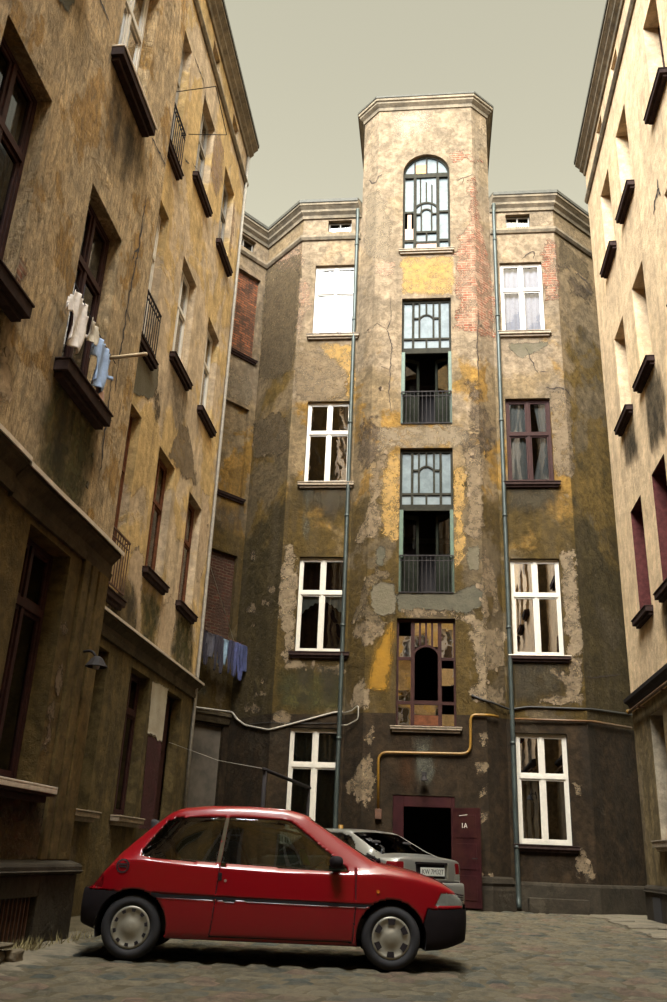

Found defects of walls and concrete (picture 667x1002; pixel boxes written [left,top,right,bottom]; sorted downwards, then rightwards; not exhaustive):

flaking render [452,176,496,338]
flaking render [539,239,593,301]
crack [98,196,147,480]
flaking render [462,446,485,539]
flaking render [246,544,346,676]
flaking render [351,566,393,647]
flaking render [401,549,507,704]
flaking render [539,549,585,706]
flaking render [350,678,370,710]
flaking render [345,725,377,809]
flaking render [575,848,597,883]